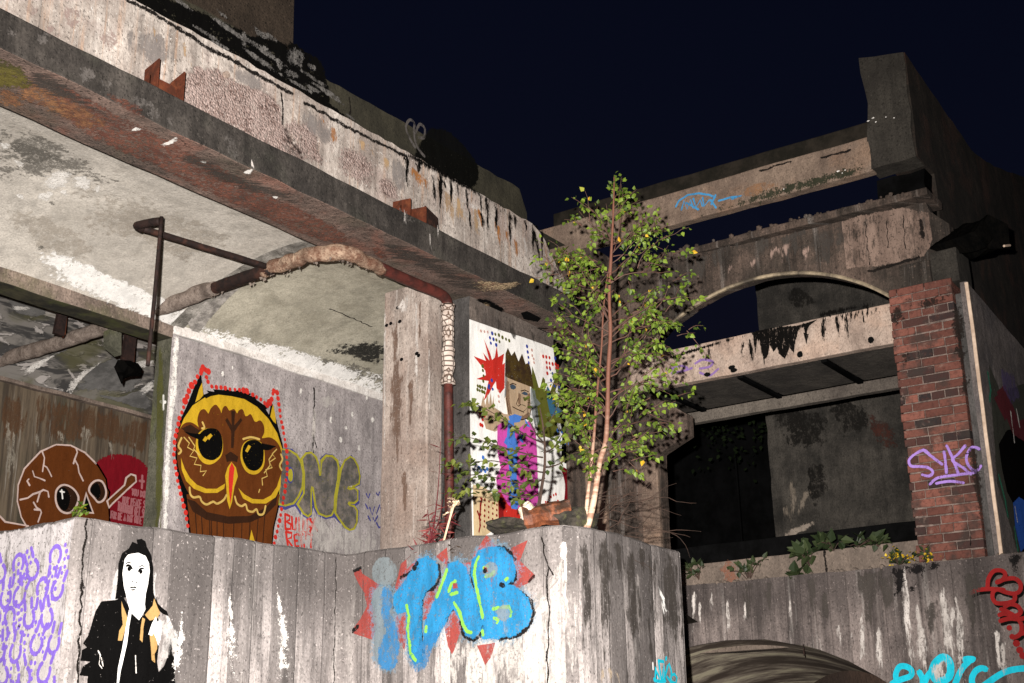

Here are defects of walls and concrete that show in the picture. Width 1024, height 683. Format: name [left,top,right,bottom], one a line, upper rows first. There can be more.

damp [128,31,173,62]
damp [392,151,544,263]
damp [322,295,430,461]
crack [76,519,88,683]
crack [541,537,554,683]
damp [857,570,980,682]
efflorescence [994,631,1006,670]